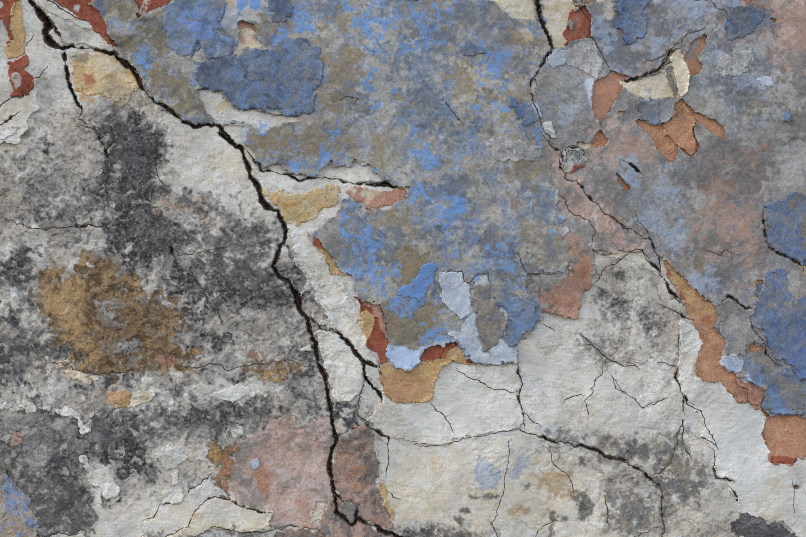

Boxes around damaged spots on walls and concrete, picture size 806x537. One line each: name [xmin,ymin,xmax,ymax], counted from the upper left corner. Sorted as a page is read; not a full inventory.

flaking render [0,0,40,144]
crack [0,0,404,537]
peeling [34,0,806,446]
crack [413,0,740,537]
crack [718,295,783,367]
peeling [0,466,41,537]
damp [0,401,124,537]
flaking render [161,471,184,504]
peeling [169,414,395,537]
flaking render [676,319,806,537]